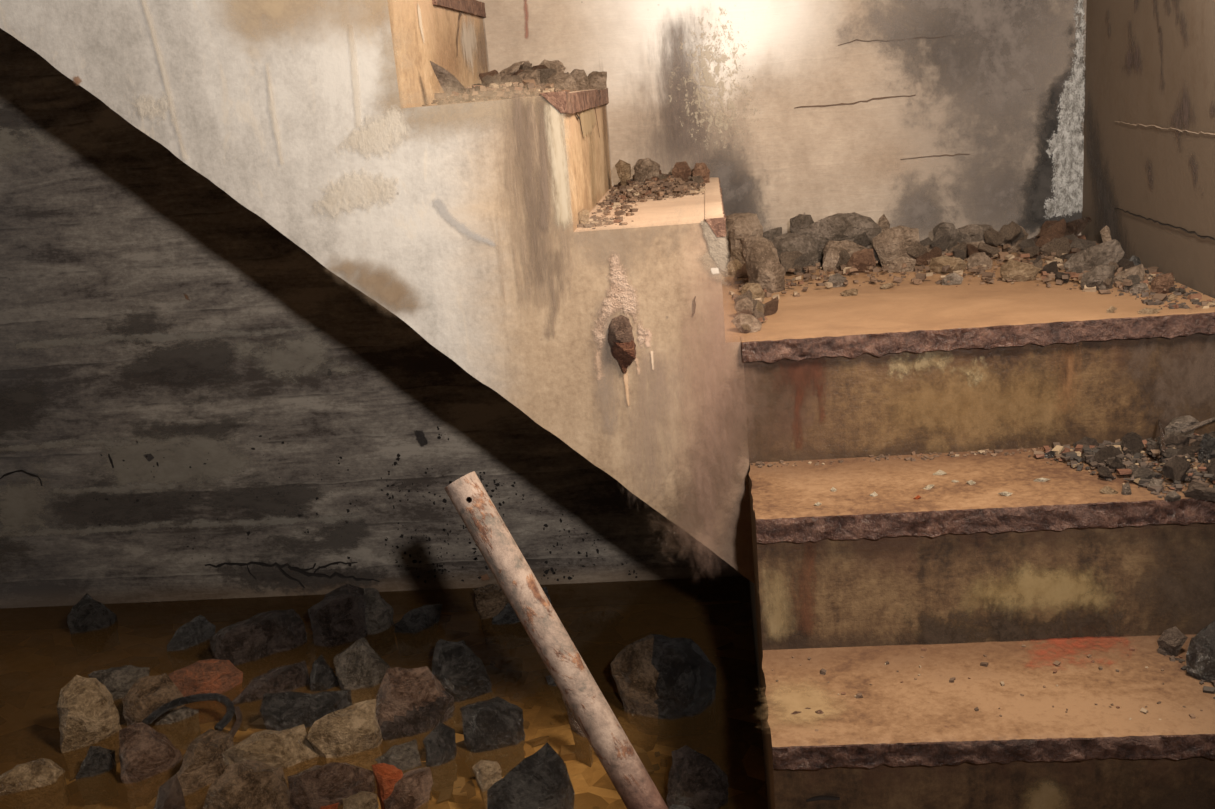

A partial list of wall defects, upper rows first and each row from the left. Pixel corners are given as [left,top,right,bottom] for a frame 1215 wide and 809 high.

crack [795,95,915,108]
leakage [870,0,1127,259]
crack [1115,121,1215,135]
crack [1115,208,1215,240]
spalling [593,254,652,379]
leakage [107,313,240,439]
crack [205,561,380,588]